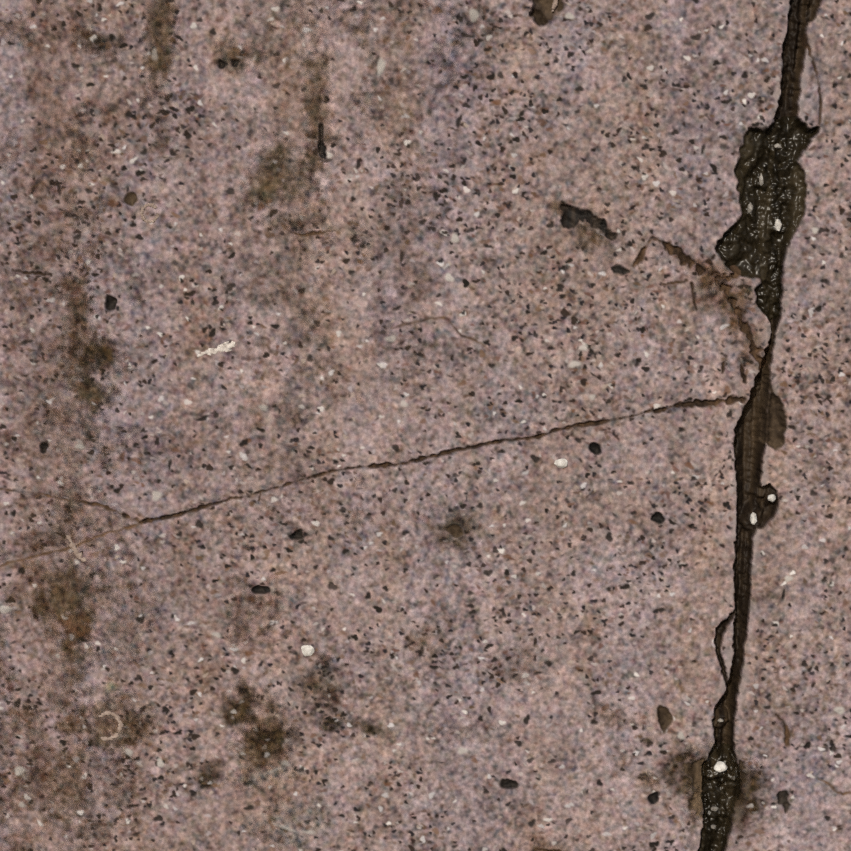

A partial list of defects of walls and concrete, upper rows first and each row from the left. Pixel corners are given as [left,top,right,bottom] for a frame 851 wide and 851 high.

spalling [528,0,567,29]
crack [287,228,337,238]
spalling [552,202,619,242]
crack [11,268,53,278]
spalling [610,263,631,277]
crack [630,235,711,277]
crack [661,278,699,312]
crack [390,314,491,352]
crack [675,0,824,851]
crack [0,394,748,549]
crack [536,843,569,851]